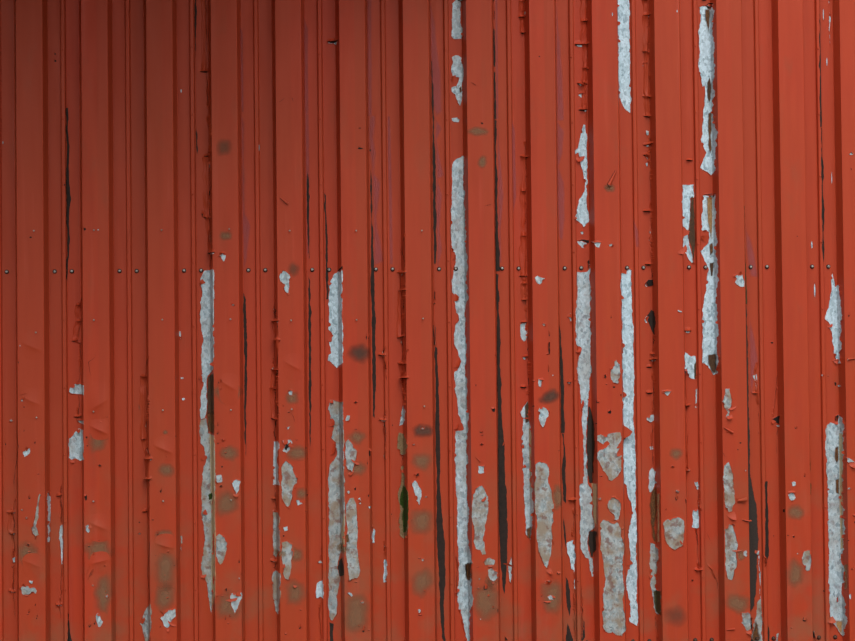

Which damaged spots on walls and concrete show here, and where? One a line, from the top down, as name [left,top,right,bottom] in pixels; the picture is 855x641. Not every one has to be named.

peeling [611,0,633,114]
peeling [686,2,719,177]
peeling [574,124,614,249]
peeling [327,269,344,369]
peeling [315,399,371,621]
peeling [450,154,515,641]
peeling [519,264,701,637]
peeling [677,184,721,408]
peeling [722,461,764,641]
peeling [825,272,849,364]
peeling [823,413,855,637]